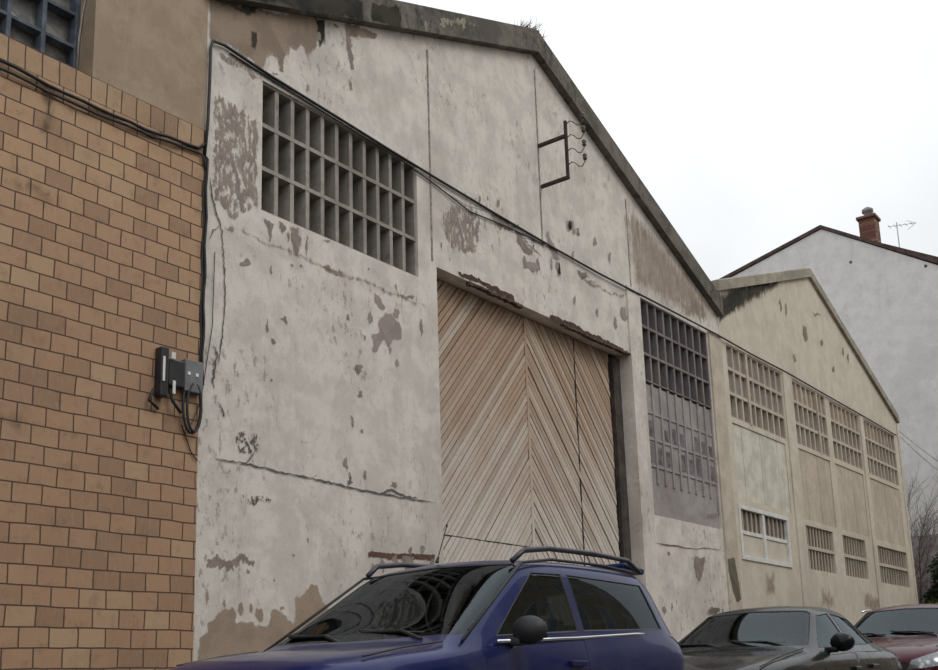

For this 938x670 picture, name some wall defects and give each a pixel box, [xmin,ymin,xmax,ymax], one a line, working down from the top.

peeling [209,0,319,79]
damp [233,0,401,90]
peeling [212,95,259,219]
peeling [264,219,309,267]
peeling [441,196,561,277]
spalling [459,272,515,301]
peeling [363,293,402,367]
spalling [236,431,260,453]
crack [215,452,435,503]
spalling [206,553,255,574]
corrosion [368,545,435,572]
peeling [197,584,329,661]